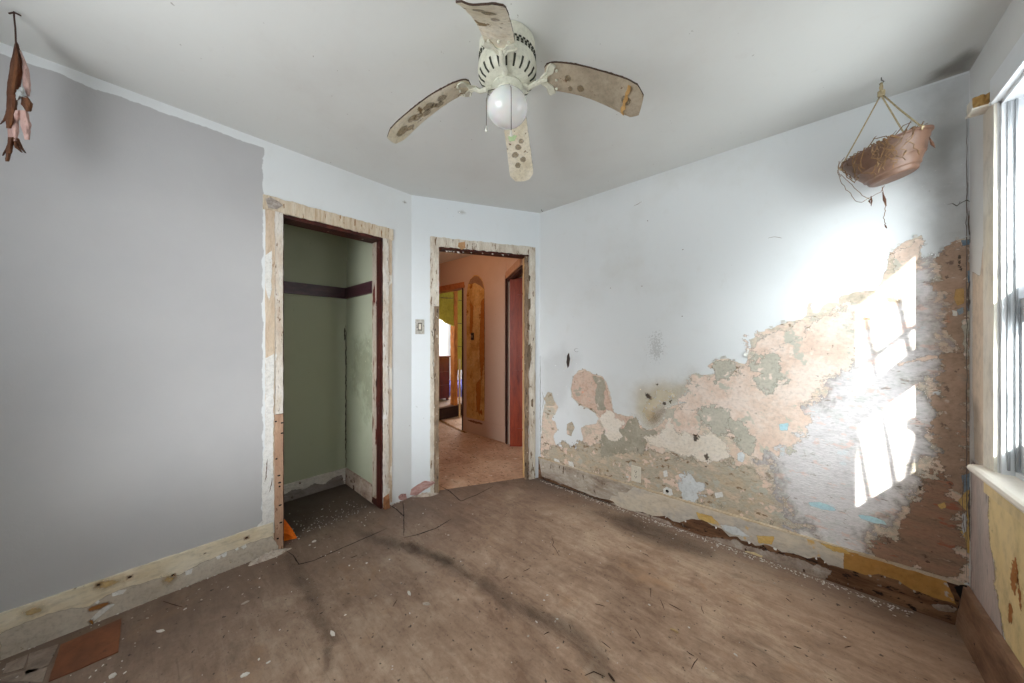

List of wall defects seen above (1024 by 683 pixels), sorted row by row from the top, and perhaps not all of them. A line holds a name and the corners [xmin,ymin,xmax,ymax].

flaking render [398,481,435,500]
peeling [531,235,1024,668]